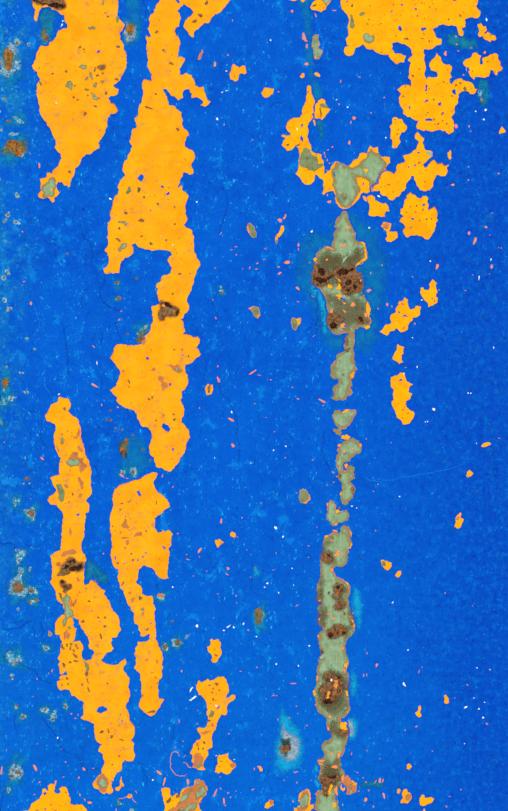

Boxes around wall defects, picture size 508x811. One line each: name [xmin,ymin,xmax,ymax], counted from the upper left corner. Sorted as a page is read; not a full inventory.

peeling [20,0,238,811]
peeling [227,62,248,84]
corrosion [275,710,303,773]
peeling [280,0,504,811]